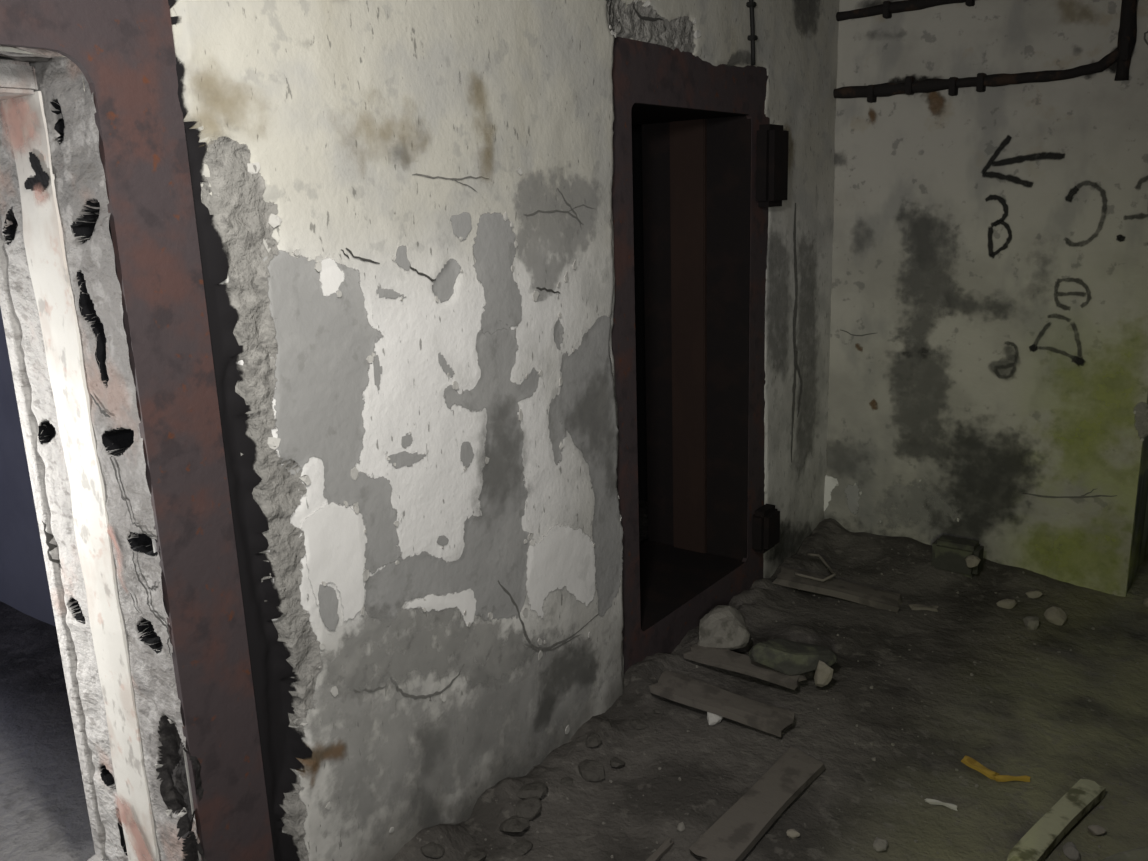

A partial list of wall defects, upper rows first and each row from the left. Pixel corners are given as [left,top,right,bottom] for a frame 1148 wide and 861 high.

leakage [794,0,820,32]
crack [413,174,489,193]
spalling [77,270,109,386]
leakage [767,238,816,460]
leakage [891,211,1034,541]
spalling [38,419,56,444]
spalling [102,427,134,456]
flaking render [201,136,623,737]
crack [110,451,171,655]
crack [498,580,599,652]
crack [353,665,464,701]
rust [295,744,345,783]